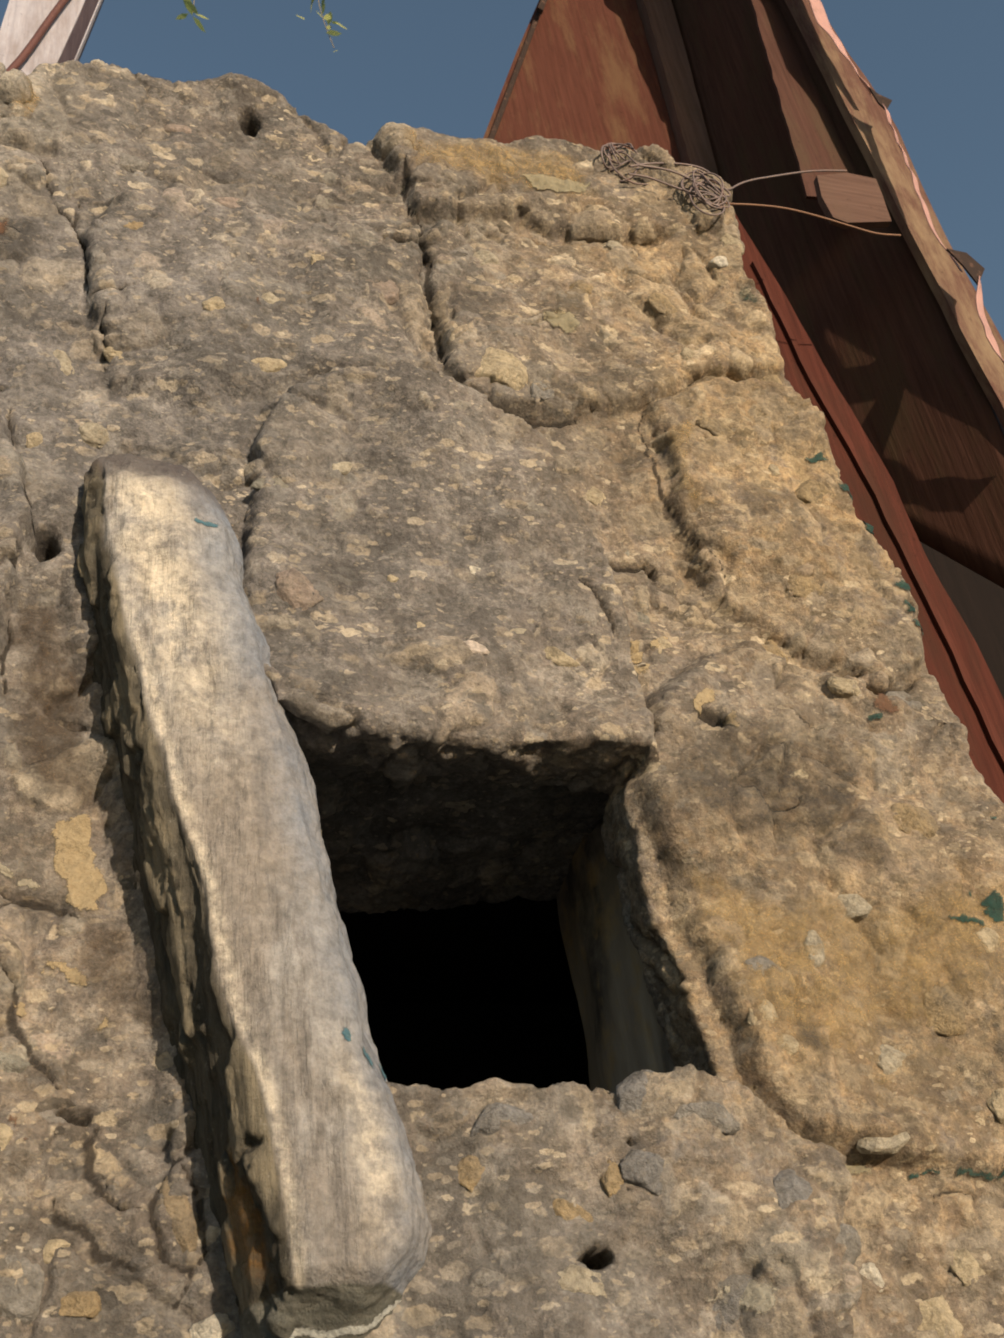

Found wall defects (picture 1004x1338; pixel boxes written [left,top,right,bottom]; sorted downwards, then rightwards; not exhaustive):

crack [41,161,123,361]
crack [396,157,446,365]
crack [0,391,14,446]
crack [638,415,726,578]
crack [0,620,11,695]
crack [6,973,59,1090]
crack [52,1128,208,1309]